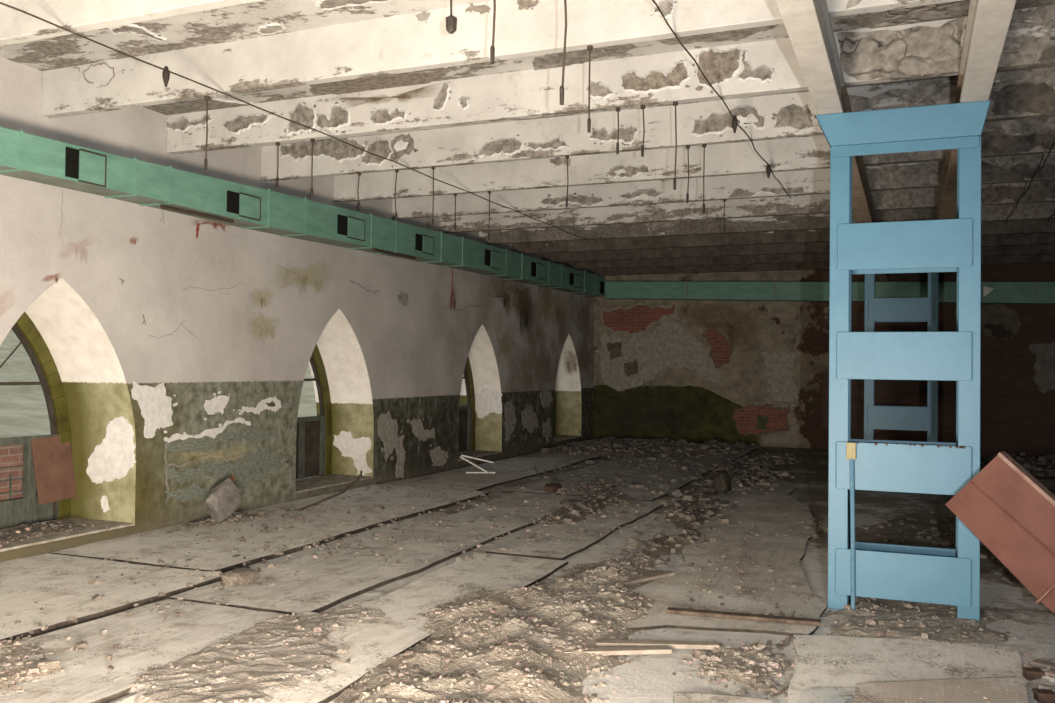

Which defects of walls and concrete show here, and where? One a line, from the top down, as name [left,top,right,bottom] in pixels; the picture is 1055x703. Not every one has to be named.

spalling [514,47,605,70]
spalling [586,24,780,101]
peeling [836,0,970,112]
spalling [143,72,470,168]
spalling [473,134,571,167]
spalling [539,163,666,207]
spalling [589,125,639,145]
peeling [595,303,733,391]
spalling [732,348,803,436]
peeling [981,304,1021,341]
peeling [1028,341,1055,393]
peeling [86,381,281,512]